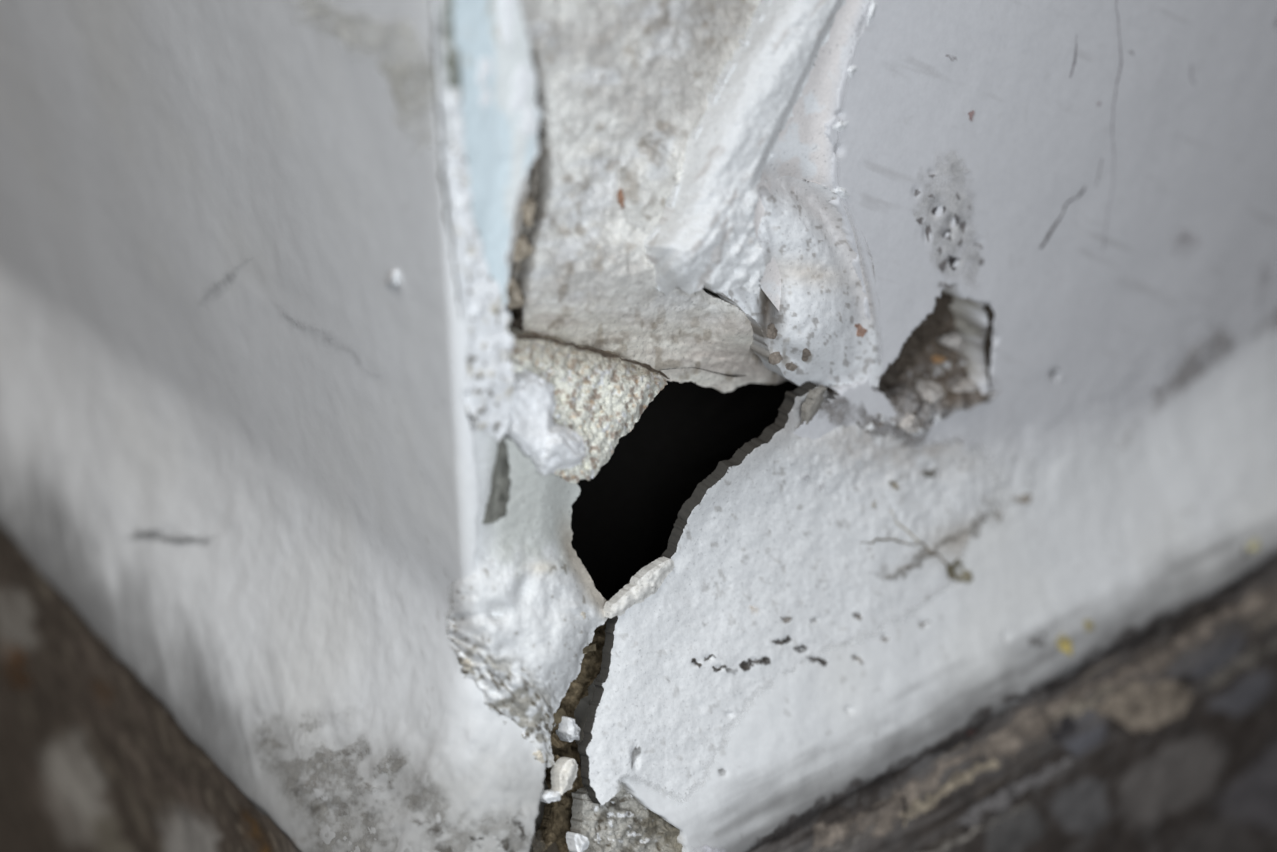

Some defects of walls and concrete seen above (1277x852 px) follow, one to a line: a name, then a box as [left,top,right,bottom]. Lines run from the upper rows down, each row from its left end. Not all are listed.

crack [1039,0,1122,249]
peeling [279,748,406,852]
peeling [406,788,545,852]
crack [531,600,609,852]
crack [505,125,670,379]
spalling [442,0,788,852]
spalling [772,617,827,666]
spalling [821,158,1001,446]
crack [860,468,973,583]
crack [1012,494,1032,504]